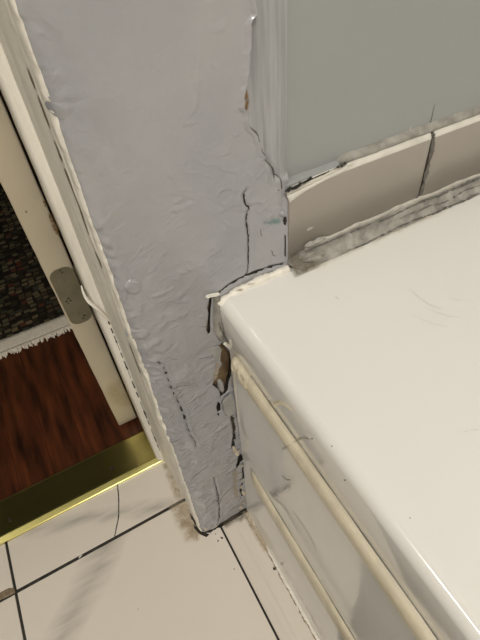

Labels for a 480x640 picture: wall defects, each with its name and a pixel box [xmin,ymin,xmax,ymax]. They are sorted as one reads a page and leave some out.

crack [205,133,480,298]
spalling [209,342,234,417]